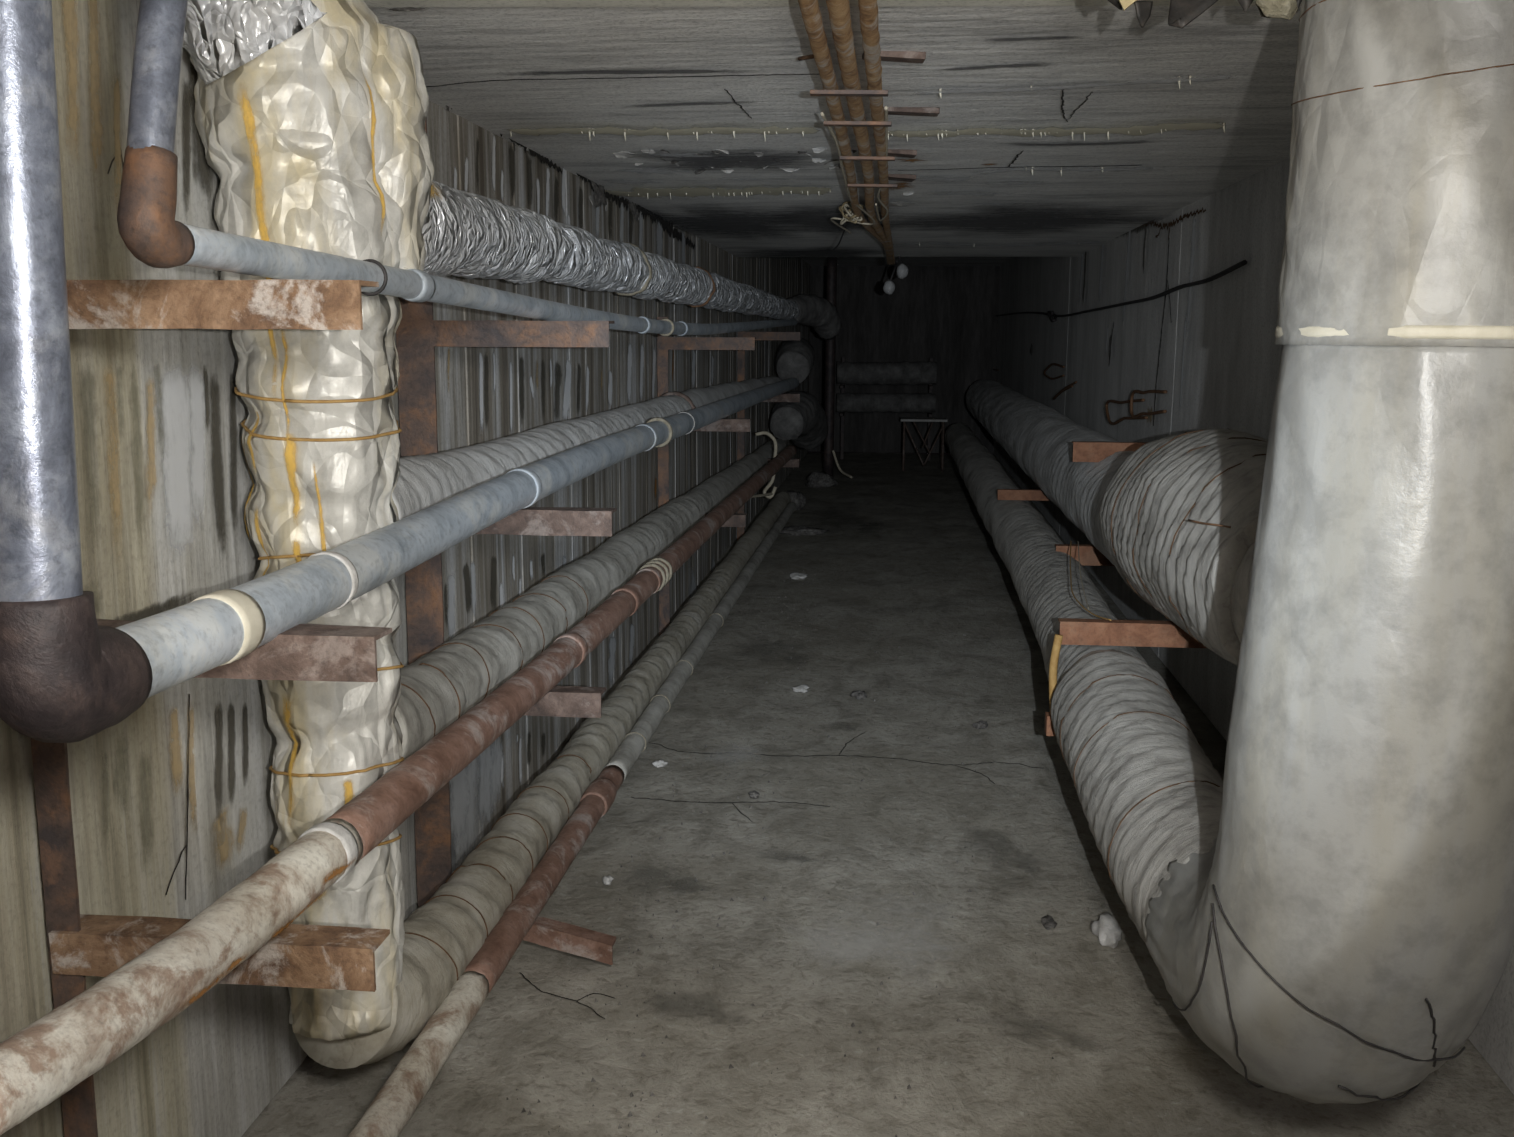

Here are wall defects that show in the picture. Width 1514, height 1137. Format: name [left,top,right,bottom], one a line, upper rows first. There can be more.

leakage [888,122,1226,146]
leakage [454,126,1152,270]
crack [652,732,1041,784]